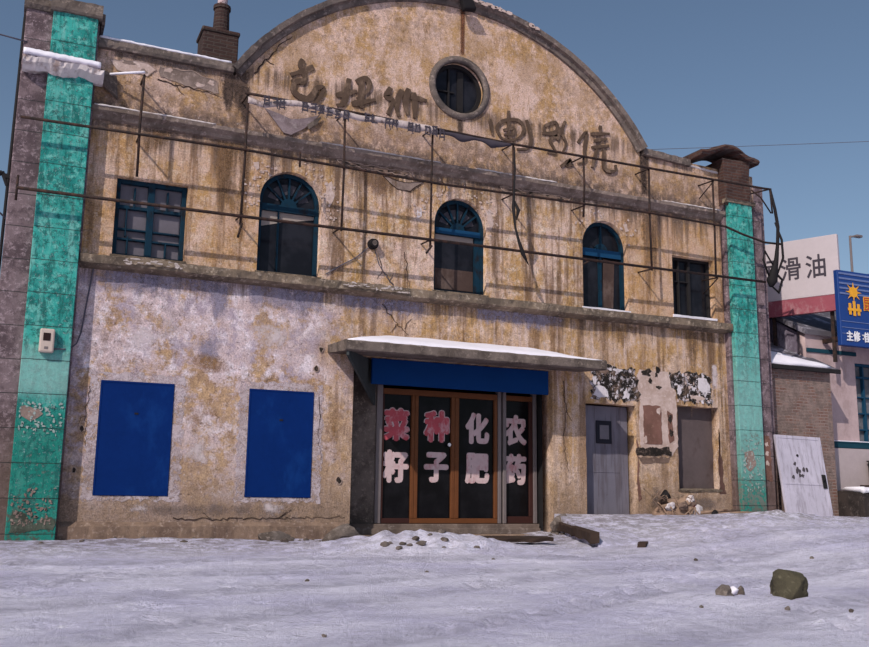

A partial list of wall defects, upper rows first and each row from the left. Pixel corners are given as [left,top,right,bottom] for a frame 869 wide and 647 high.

crack [254,36,293,74]
spalling [109,59,219,94]
water stain [216,142,249,212]
peeling [18,401,64,436]
peeling [589,364,713,501]
peeling [9,487,55,533]
crack [173,510,309,521]